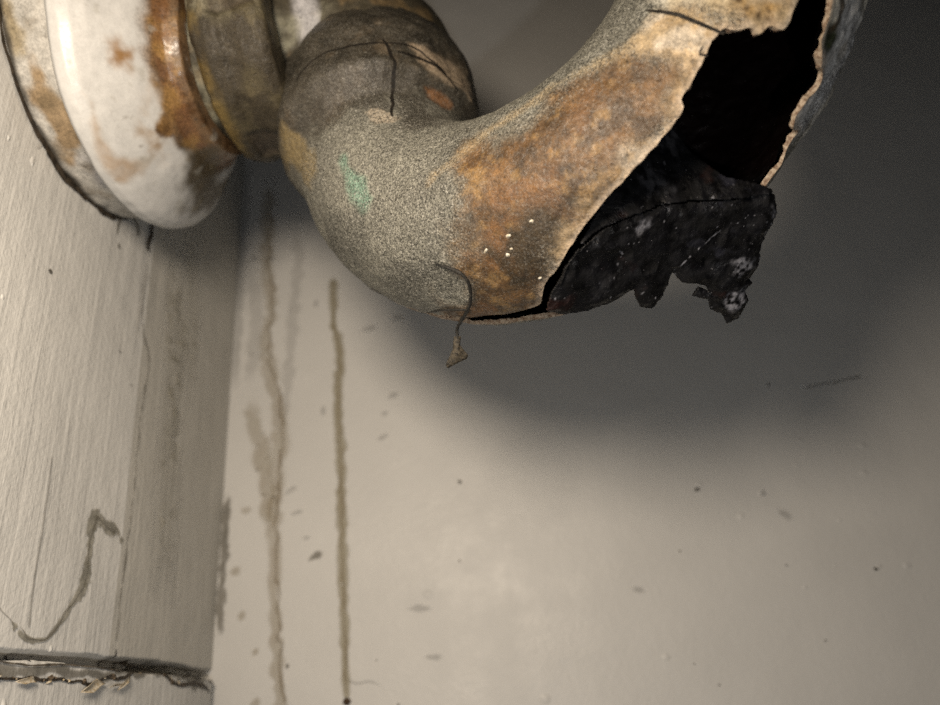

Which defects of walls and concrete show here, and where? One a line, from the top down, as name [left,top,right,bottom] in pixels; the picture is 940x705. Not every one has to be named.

crack [0,649,213,693]